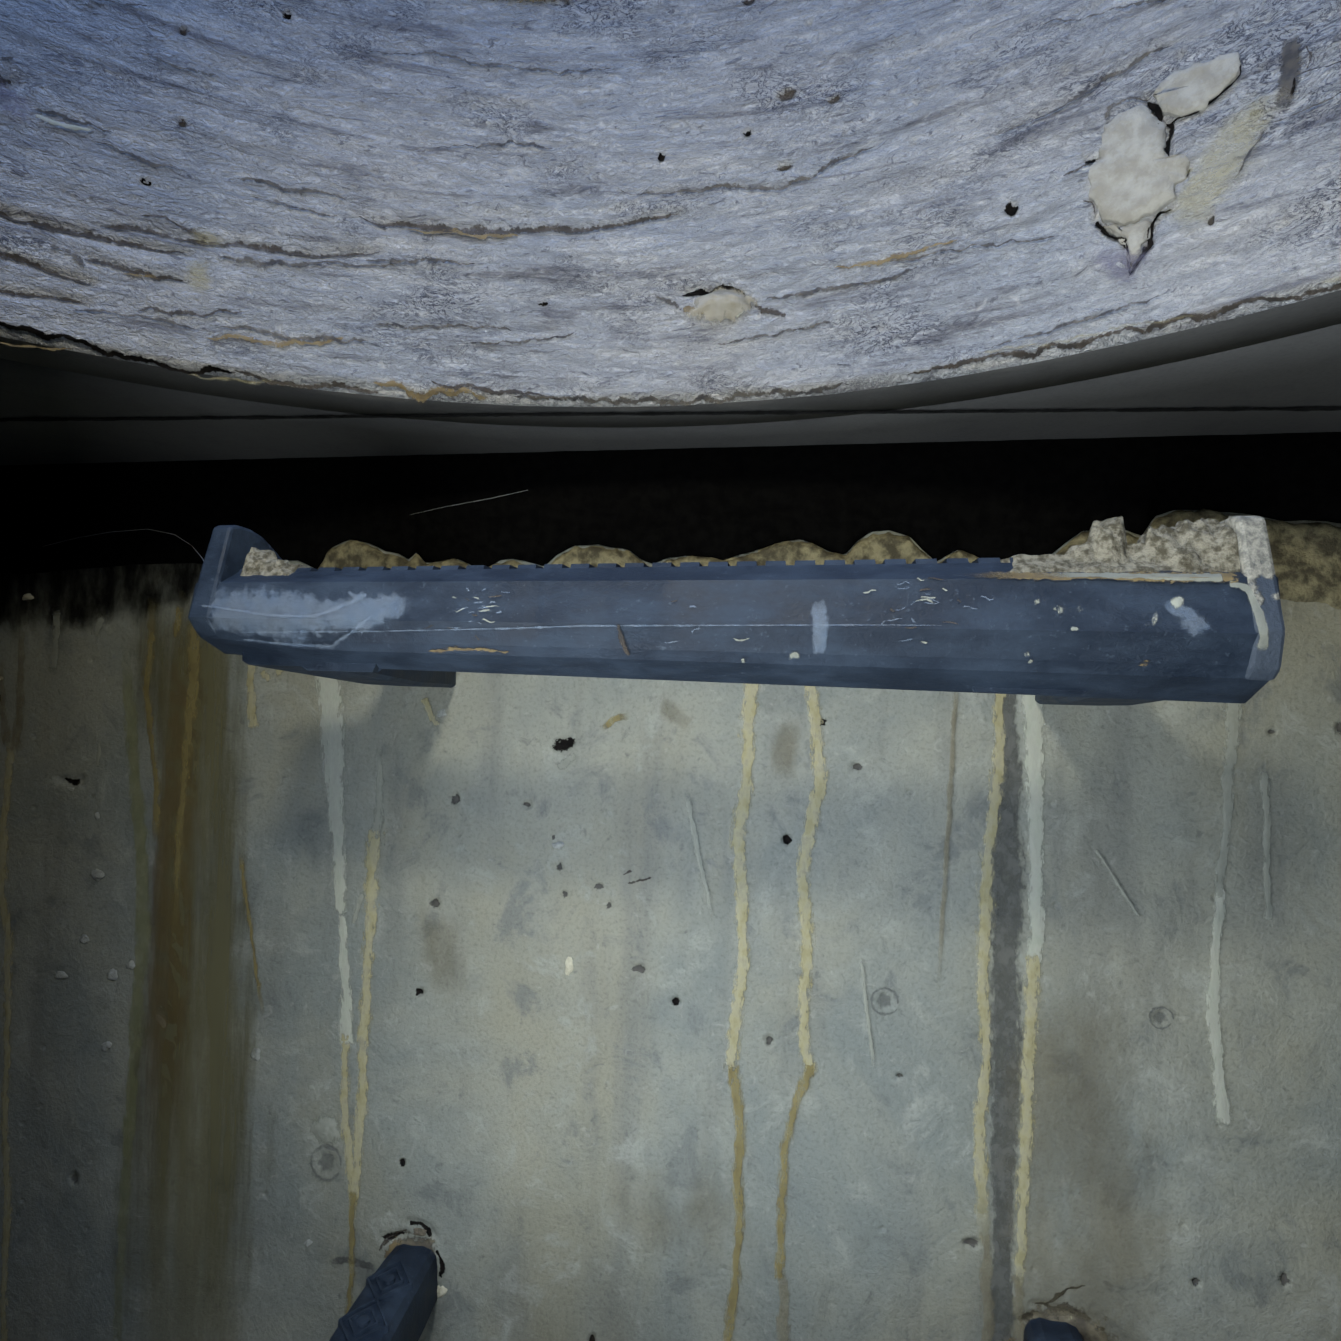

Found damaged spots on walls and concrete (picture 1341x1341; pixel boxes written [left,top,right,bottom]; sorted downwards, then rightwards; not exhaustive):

spalling [0,321,848,406]
spalling [908,283,1341,375]
spalling [379,1221,447,1298]
spalling [1007,1285,1118,1341]